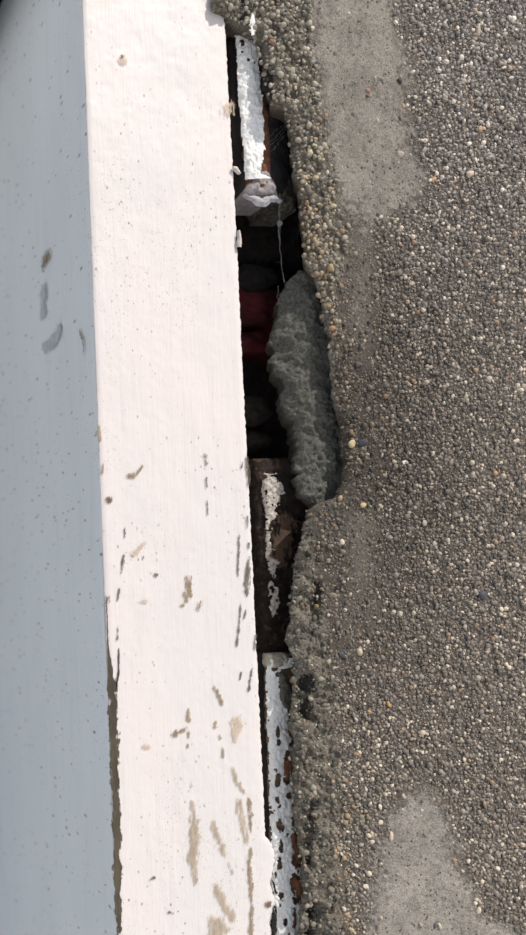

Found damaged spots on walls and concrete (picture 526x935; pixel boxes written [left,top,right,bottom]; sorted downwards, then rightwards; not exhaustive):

peeling [242,194,282,207]
spalling [248,270,342,652]
peeling [106,598,123,935]
peeling [170,708,191,748]